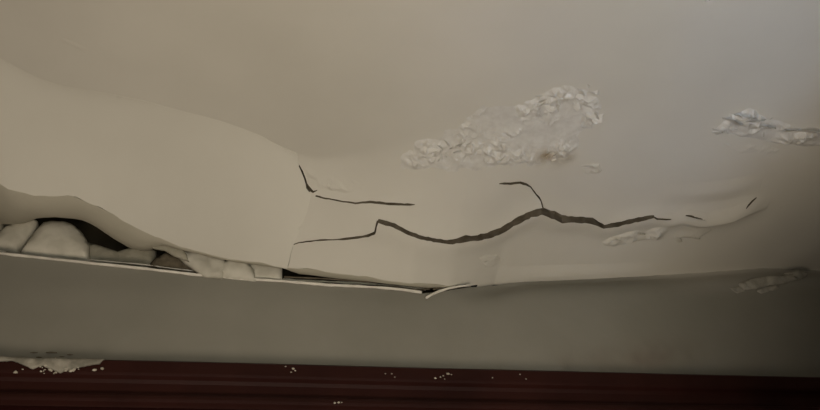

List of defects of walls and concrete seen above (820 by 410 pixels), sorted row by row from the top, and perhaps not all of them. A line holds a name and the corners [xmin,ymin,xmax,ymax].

peeling [400,84,604,172]
peeling [712,108,820,146]
crack [294,165,702,245]
flaking render [152,245,225,279]
flaking render [0,352,104,374]